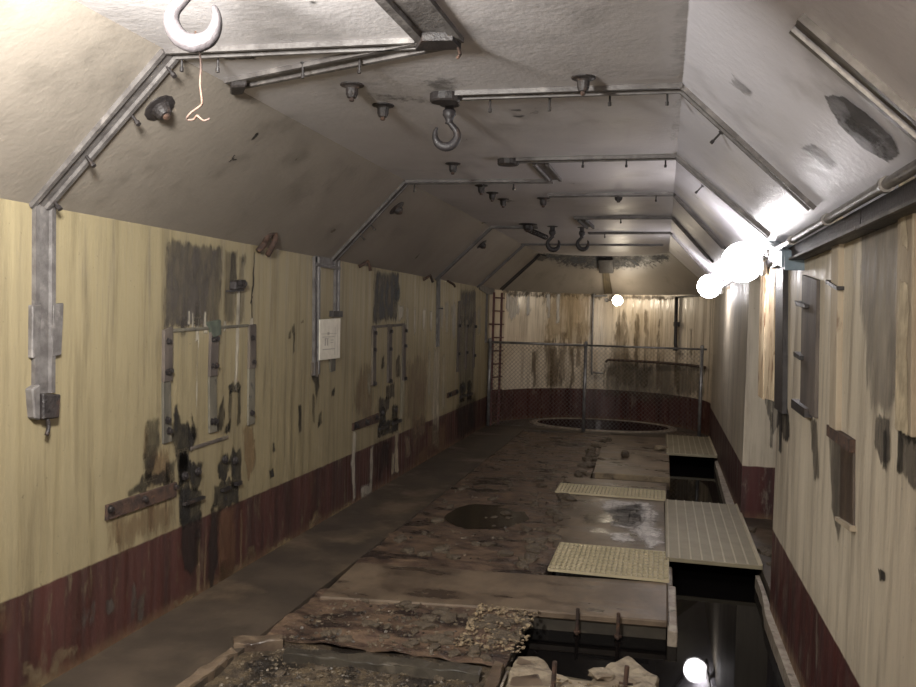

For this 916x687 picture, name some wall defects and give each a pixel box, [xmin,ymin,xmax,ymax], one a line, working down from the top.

damp [825,95,899,162]
damp [505,291,675,323]
damp [604,311,695,402]
damp [217,398,231,433]
damp [129,405,256,588]